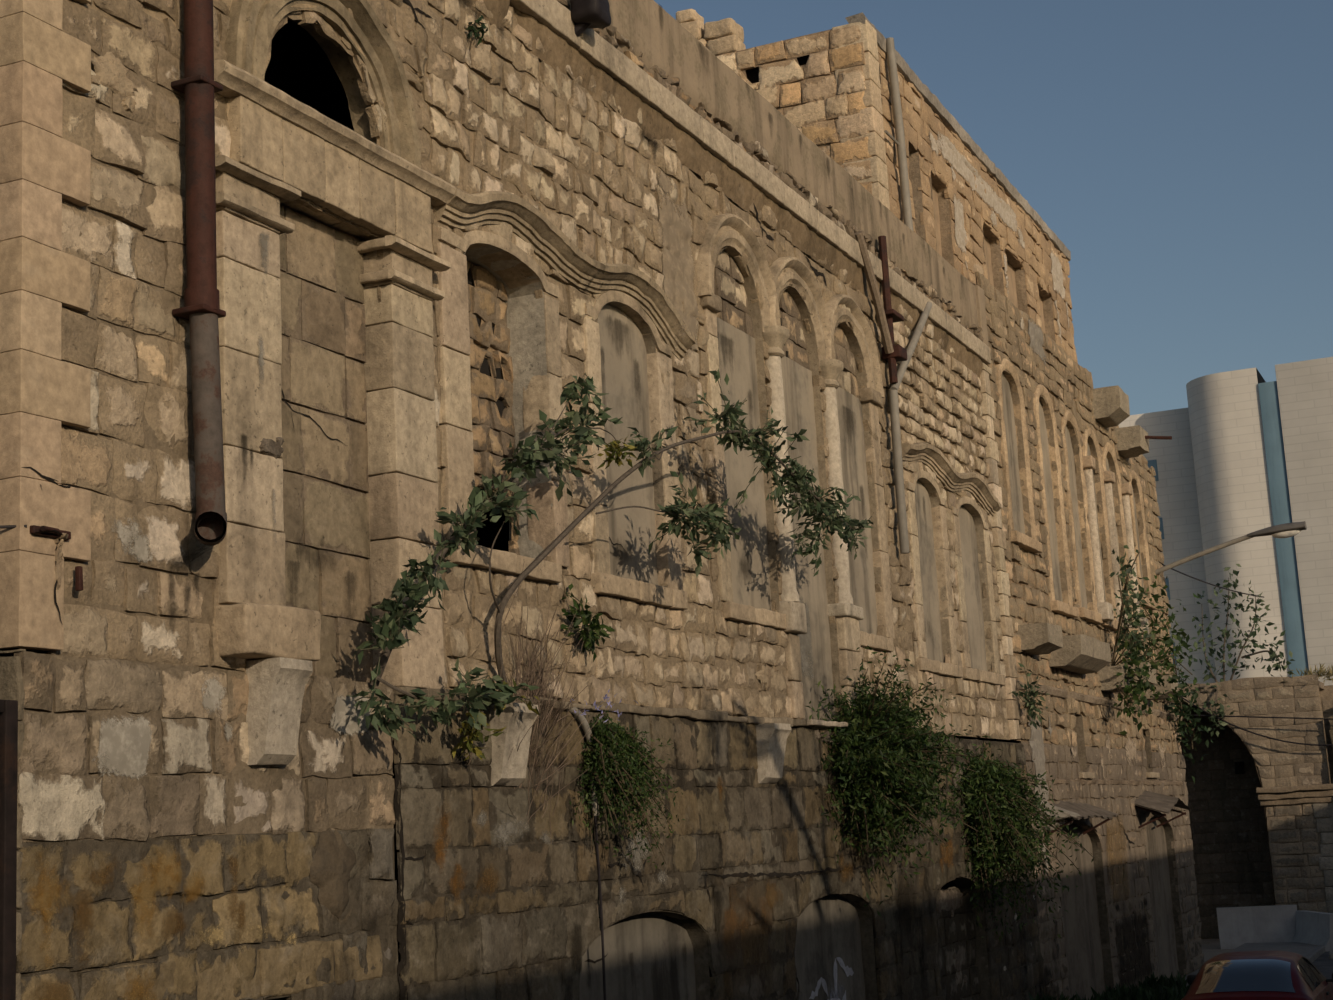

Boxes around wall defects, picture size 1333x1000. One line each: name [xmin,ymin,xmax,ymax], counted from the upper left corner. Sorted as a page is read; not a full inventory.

crack [404,0,433,33]
crack [281,388,348,446]